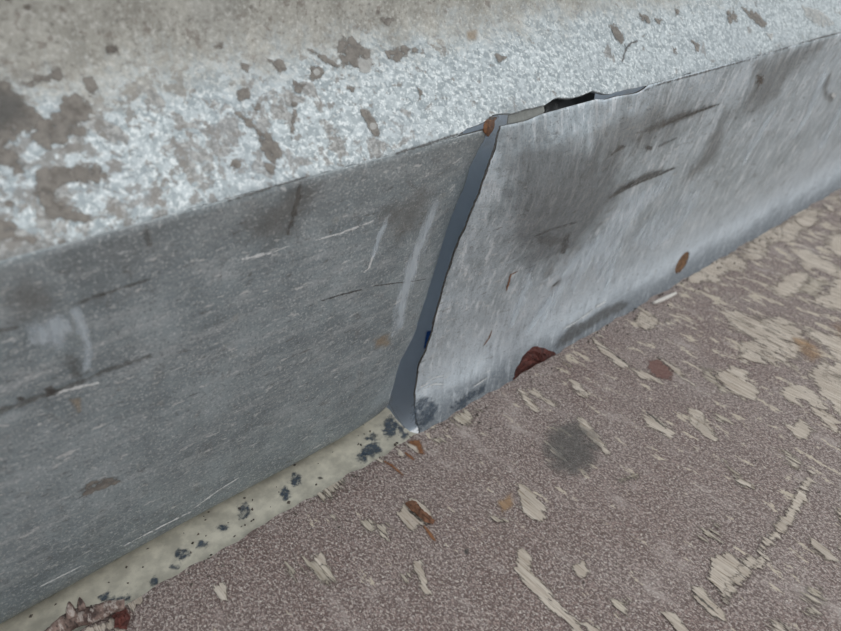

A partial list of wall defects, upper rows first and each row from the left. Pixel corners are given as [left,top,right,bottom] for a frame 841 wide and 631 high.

crack [645,32,839,91]
peeling [360,109,380,137]
crack [396,132,463,154]
corrosion [483,117,497,137]
crack [228,177,307,201]
crack [413,131,499,433]
corrosion [675,252,689,273]
peeling [687,203,841,312]
peeling [700,309,841,433]
peeling [517,480,549,522]
peeling [513,547,602,631]
peeling [691,520,773,622]